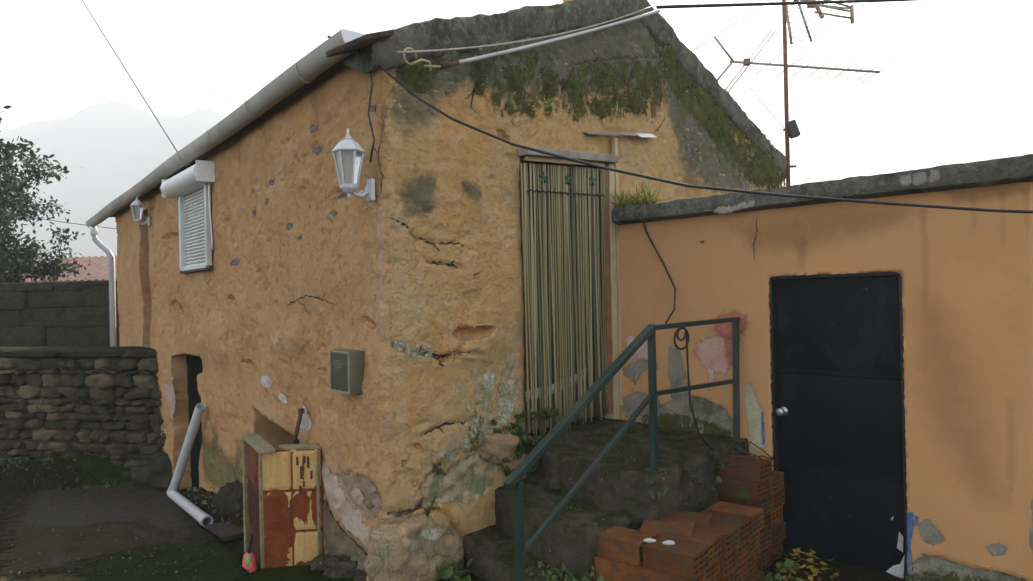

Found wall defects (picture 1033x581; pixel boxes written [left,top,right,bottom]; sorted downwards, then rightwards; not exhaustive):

leakage [389,12,759,213]
crack [288,293,335,315]
flaking render [622,334,733,437]
peeling [744,382,766,449]
peeling [322,463,383,580]
flaking render [886,519,1026,581]